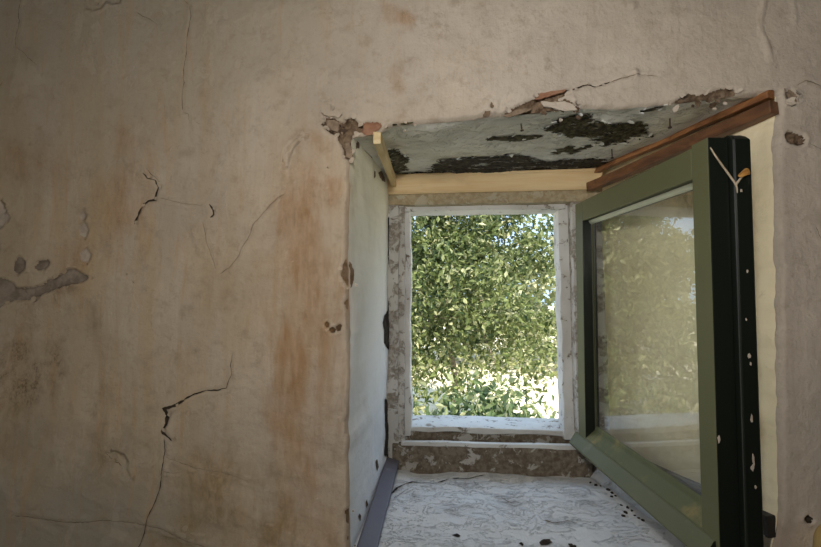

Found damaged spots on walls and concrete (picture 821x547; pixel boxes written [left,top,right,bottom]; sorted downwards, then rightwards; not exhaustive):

peeling [784,88,804,106]
spalling [318,104,416,163]
peeling [387,83,743,174]
spalling [785,132,805,146]
crack [134,168,284,274]
spalling [0,246,93,308]
crack [17,360,250,547]